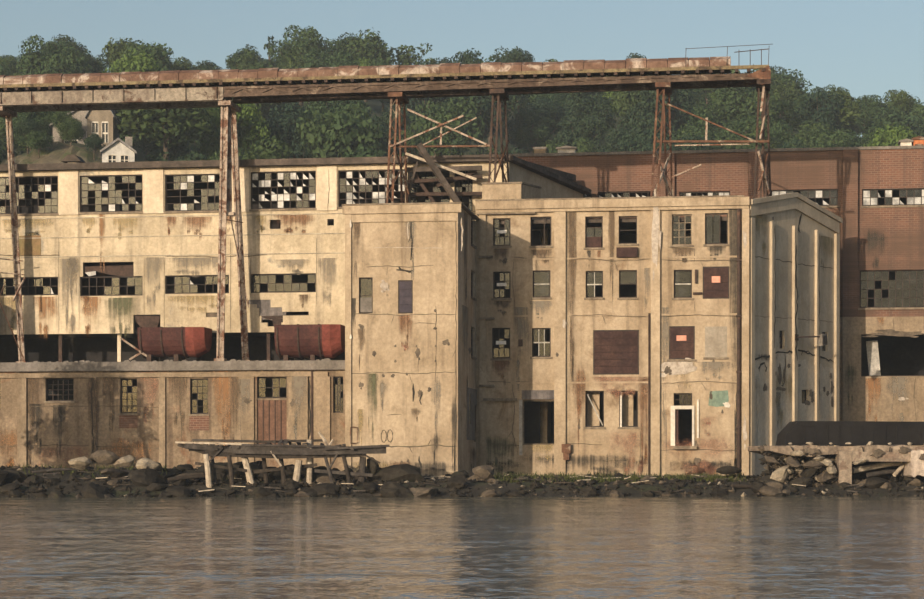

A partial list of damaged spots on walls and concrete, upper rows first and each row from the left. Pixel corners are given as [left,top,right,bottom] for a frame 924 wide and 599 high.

rust [34,297,55,335]
rust [83,296,98,314]
crack [755,349,833,362]
water stain [20,372,42,453]
water stain [53,405,65,454]
water stain [88,378,114,431]
peeling [743,351,834,476]
water stain [566,456,627,474]